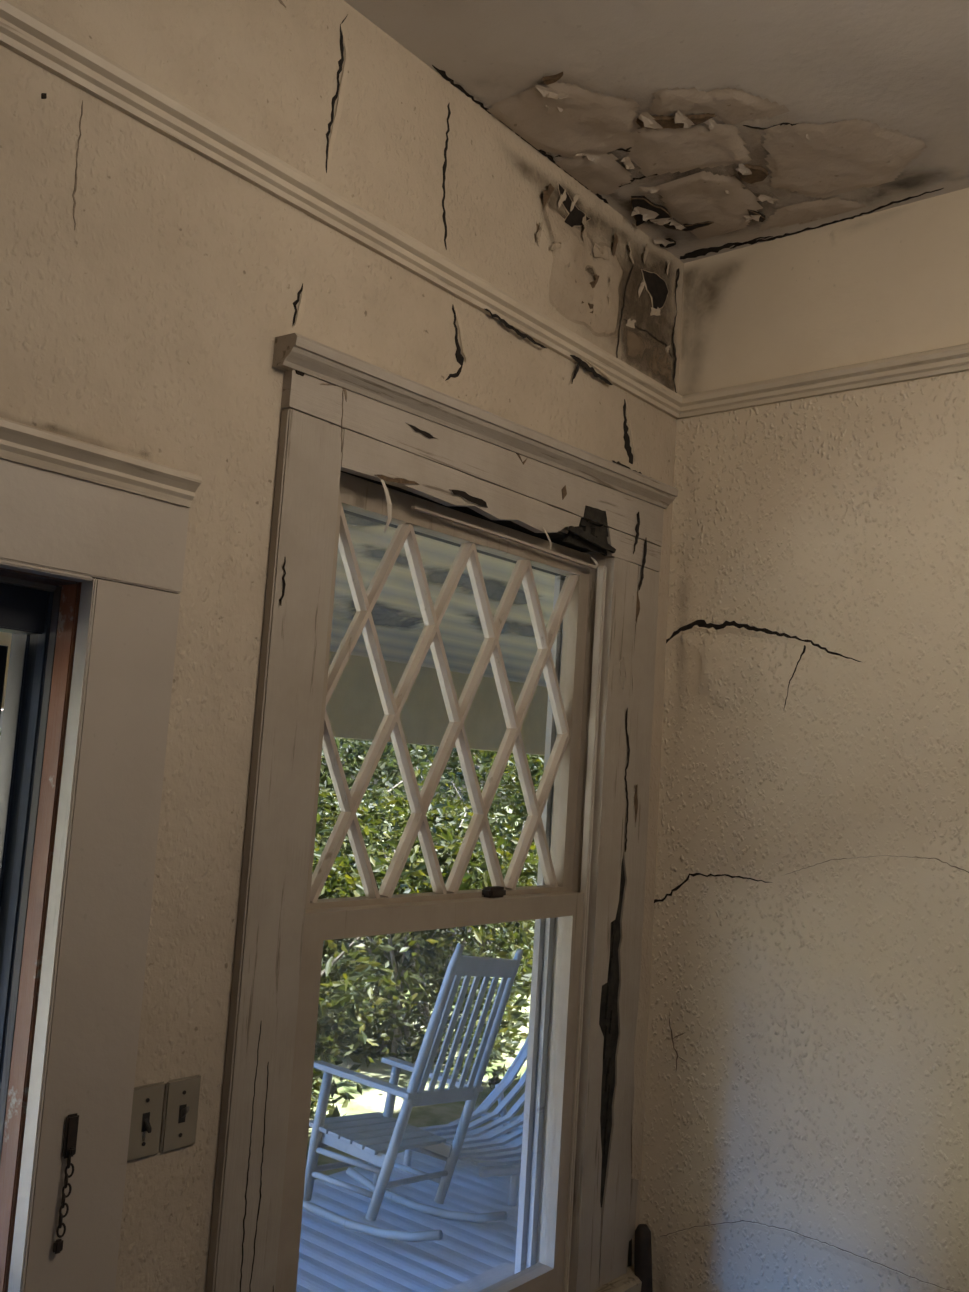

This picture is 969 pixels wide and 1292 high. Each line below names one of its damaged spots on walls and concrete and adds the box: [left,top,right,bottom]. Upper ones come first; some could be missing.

crack [326,16,349,174]
crack [432,65,658,250]
peeling [487,72,928,316]
crack [445,305,467,381]
spalling [584,506,608,526]
crack [666,620,861,708]
crack [654,855,969,903]